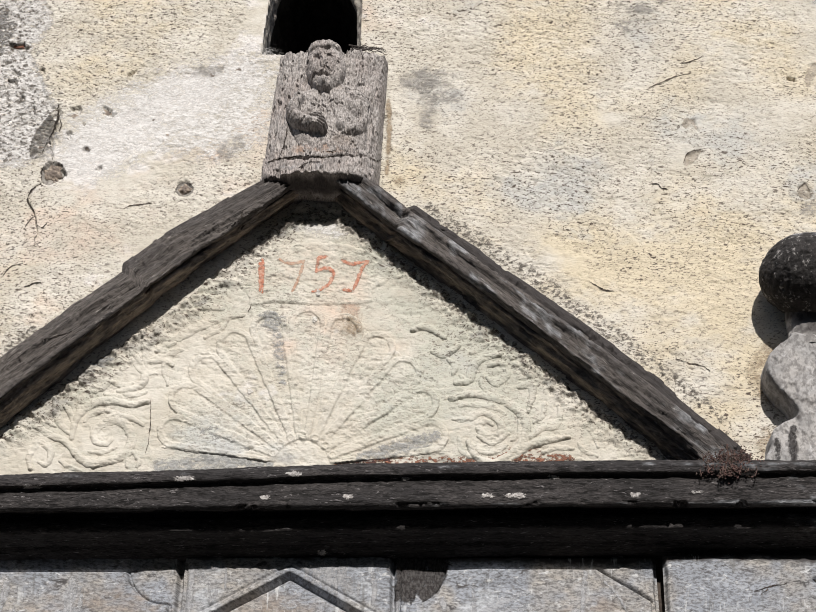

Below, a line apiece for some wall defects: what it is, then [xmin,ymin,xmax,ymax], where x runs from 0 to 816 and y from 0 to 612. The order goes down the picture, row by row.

peeling [0,0,279,185]
crack [42,105,62,159]
flaking render [175,182,193,197]
water stain [394,557,448,612]